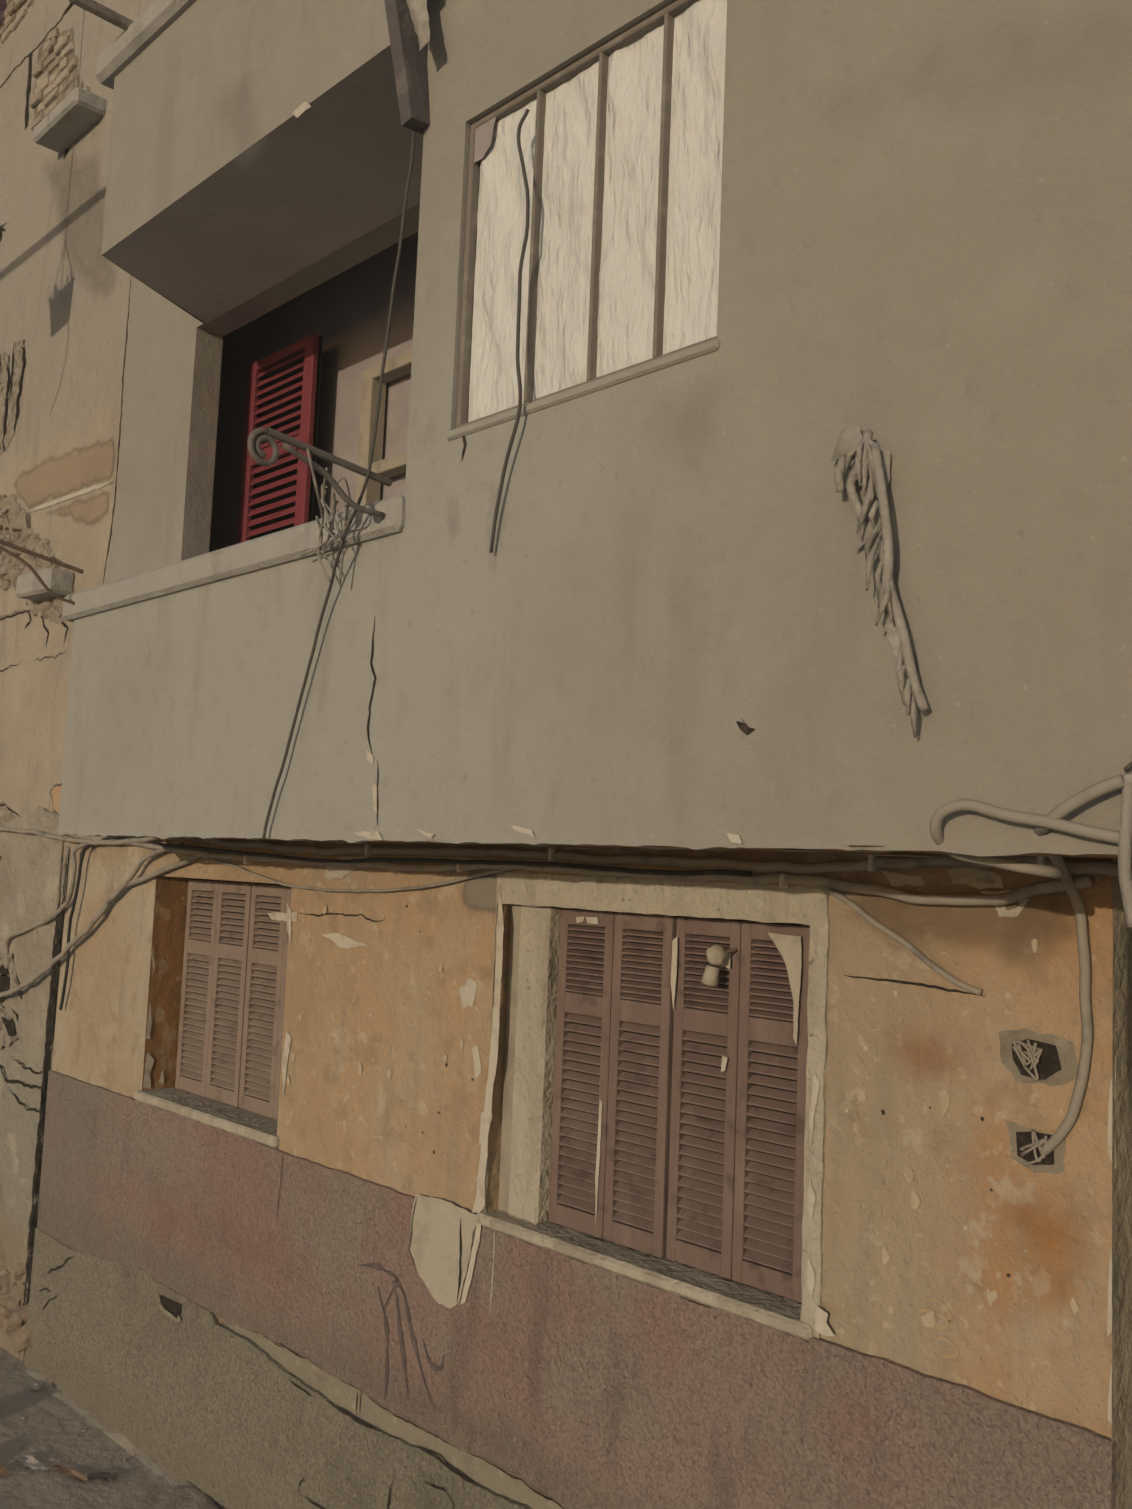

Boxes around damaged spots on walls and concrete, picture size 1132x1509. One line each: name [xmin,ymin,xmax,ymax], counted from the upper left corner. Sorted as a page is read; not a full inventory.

flaking render [0,493,74,643]
crack [367,619,378,824]
peeling [324,831,383,880]
flaking render [510,825,604,849]
flaking render [722,833,742,851]
peeling [847,845,932,886]
peeling [946,867,1029,917]
peeling [268,903,304,942]
peeling [322,933,367,949]
flaking render [0,952,21,1049]
peeling [409,892,504,1309]
flaking render [0,1240,32,1353]